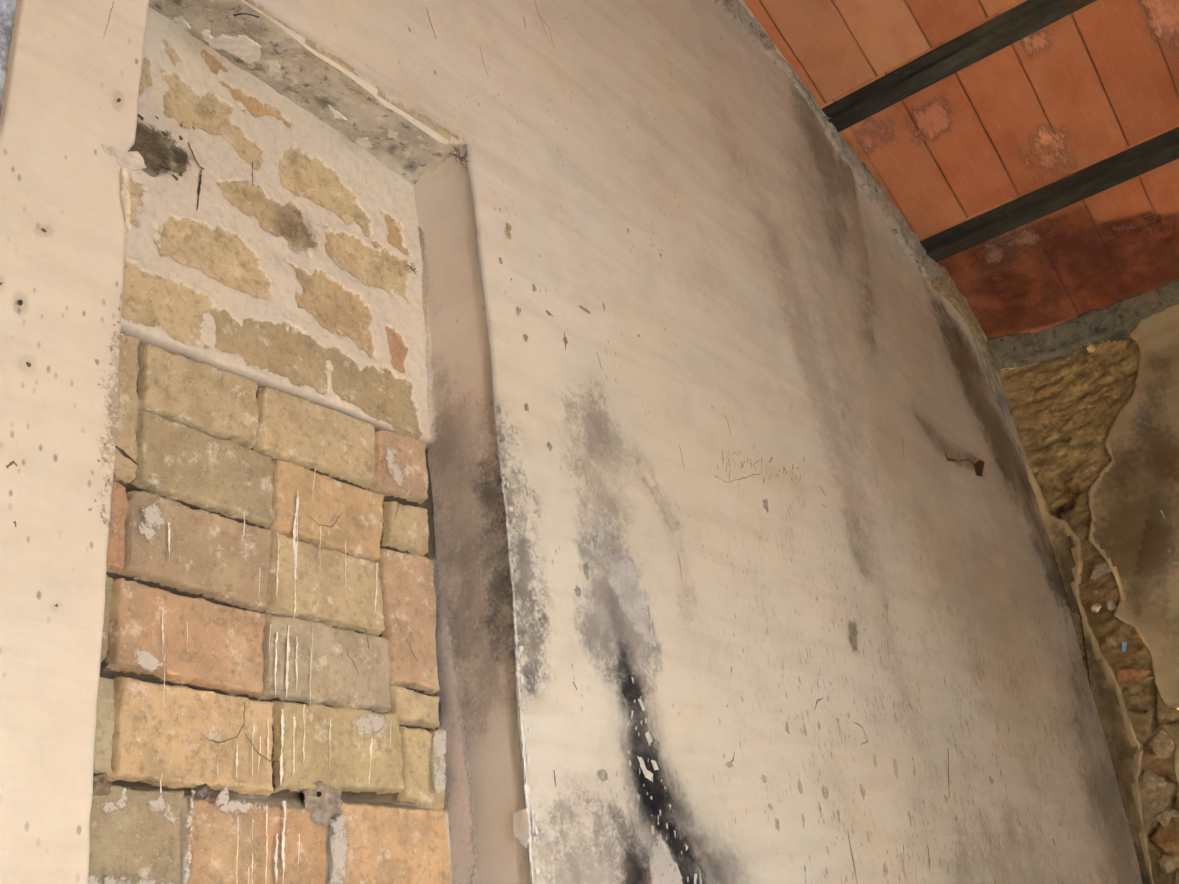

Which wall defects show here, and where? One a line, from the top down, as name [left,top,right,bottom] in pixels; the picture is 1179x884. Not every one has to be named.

spalling [100,144,146,231]
spalling [149,0,465,185]
water stain [911,99,951,141]
water stain [1019,125,1075,171]
spalling [998,336,1179,884]